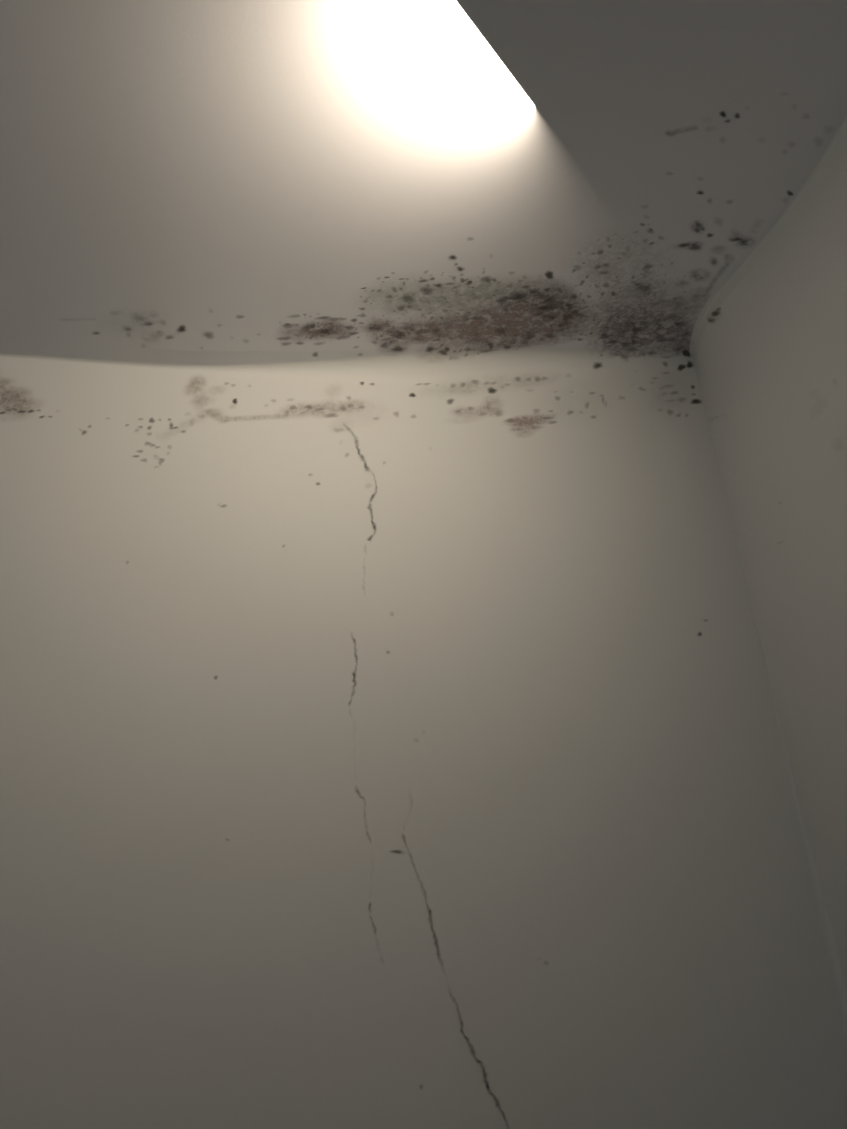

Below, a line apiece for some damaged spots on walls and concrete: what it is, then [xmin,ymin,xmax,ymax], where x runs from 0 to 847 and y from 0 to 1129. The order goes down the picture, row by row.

damp [302,317,356,337]
damp [368,272,583,354]